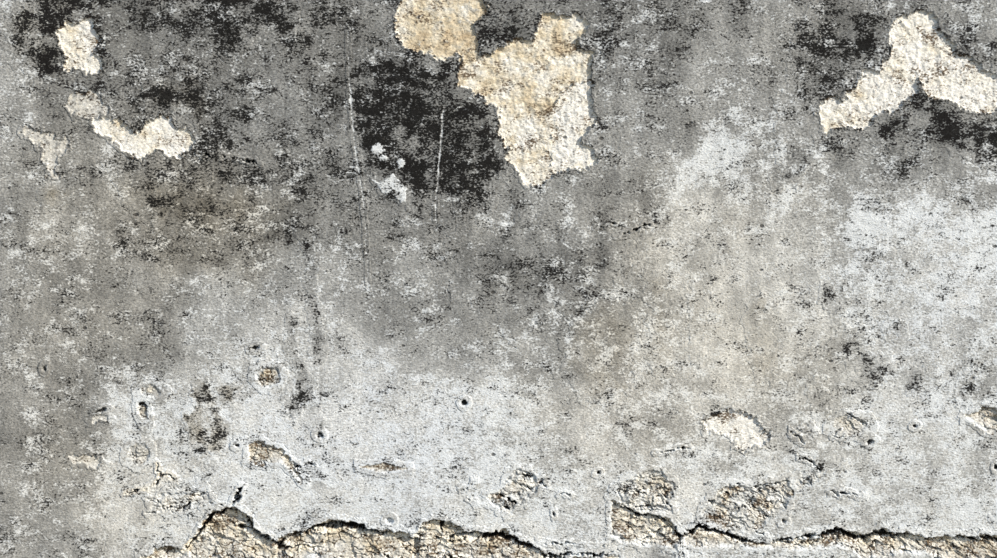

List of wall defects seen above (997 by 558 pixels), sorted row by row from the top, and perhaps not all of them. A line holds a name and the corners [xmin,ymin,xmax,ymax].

peeling [16,121,73,182]
peeling [52,13,198,164]
water stain [0,0,302,98]
water stain [134,61,223,143]
water stain [101,154,276,252]
water stain [344,36,640,350]
peeling [391,0,603,191]
water stain [767,0,997,193]
peeling [813,4,997,141]
spalling [133,463,549,558]
crack [119,408,997,558]
spalling [590,464,997,558]